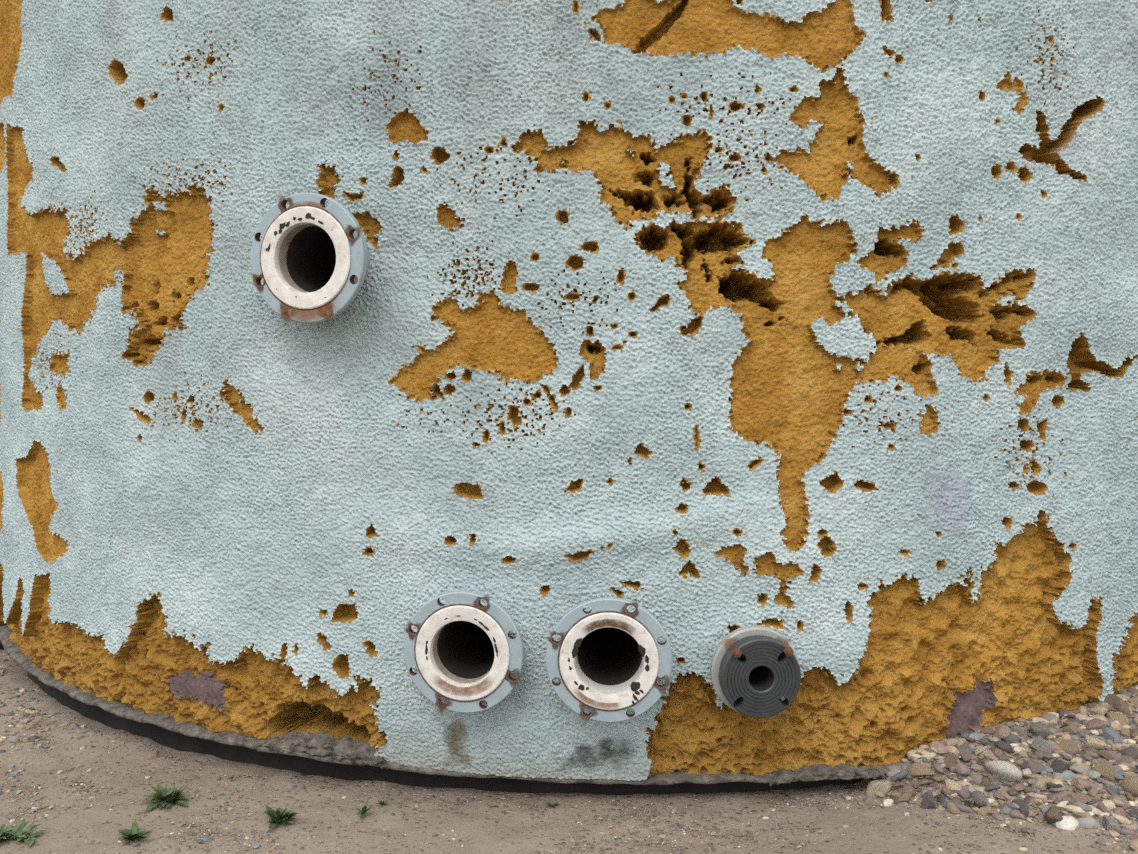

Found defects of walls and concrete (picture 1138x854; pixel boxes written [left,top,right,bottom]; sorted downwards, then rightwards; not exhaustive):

peeling [0,0,23,105]
spalling [107,59,128,85]
spalling [134,5,243,112]
peeling [0,122,233,412]
peeling [266,213,323,251]
peeling [315,160,382,250]
peeling [351,0,1138,633]
peeling [129,371,265,443]
peeling [0,440,387,756]
peeling [568,638,589,691]
peeling [630,645,649,705]
peeling [645,510,1138,778]